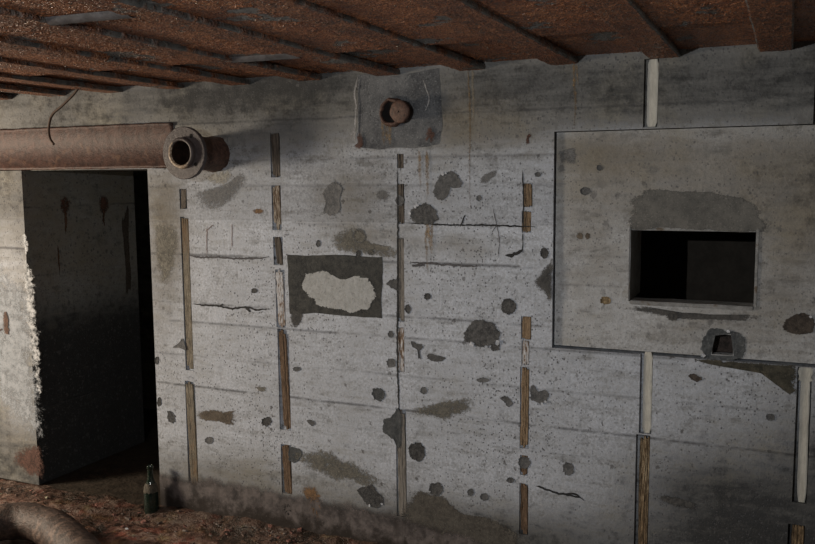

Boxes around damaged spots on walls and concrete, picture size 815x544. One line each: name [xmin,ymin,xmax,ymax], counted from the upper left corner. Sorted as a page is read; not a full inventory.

peeling [322,182,342,216]
peeling [377,191,404,206]
spalling [408,171,462,225]
crack [195,304,270,312]
spalling [464,319,500,351]
spalling [701,328,746,360]
crack [537,486,583,500]
water stain [159,475,518,544]